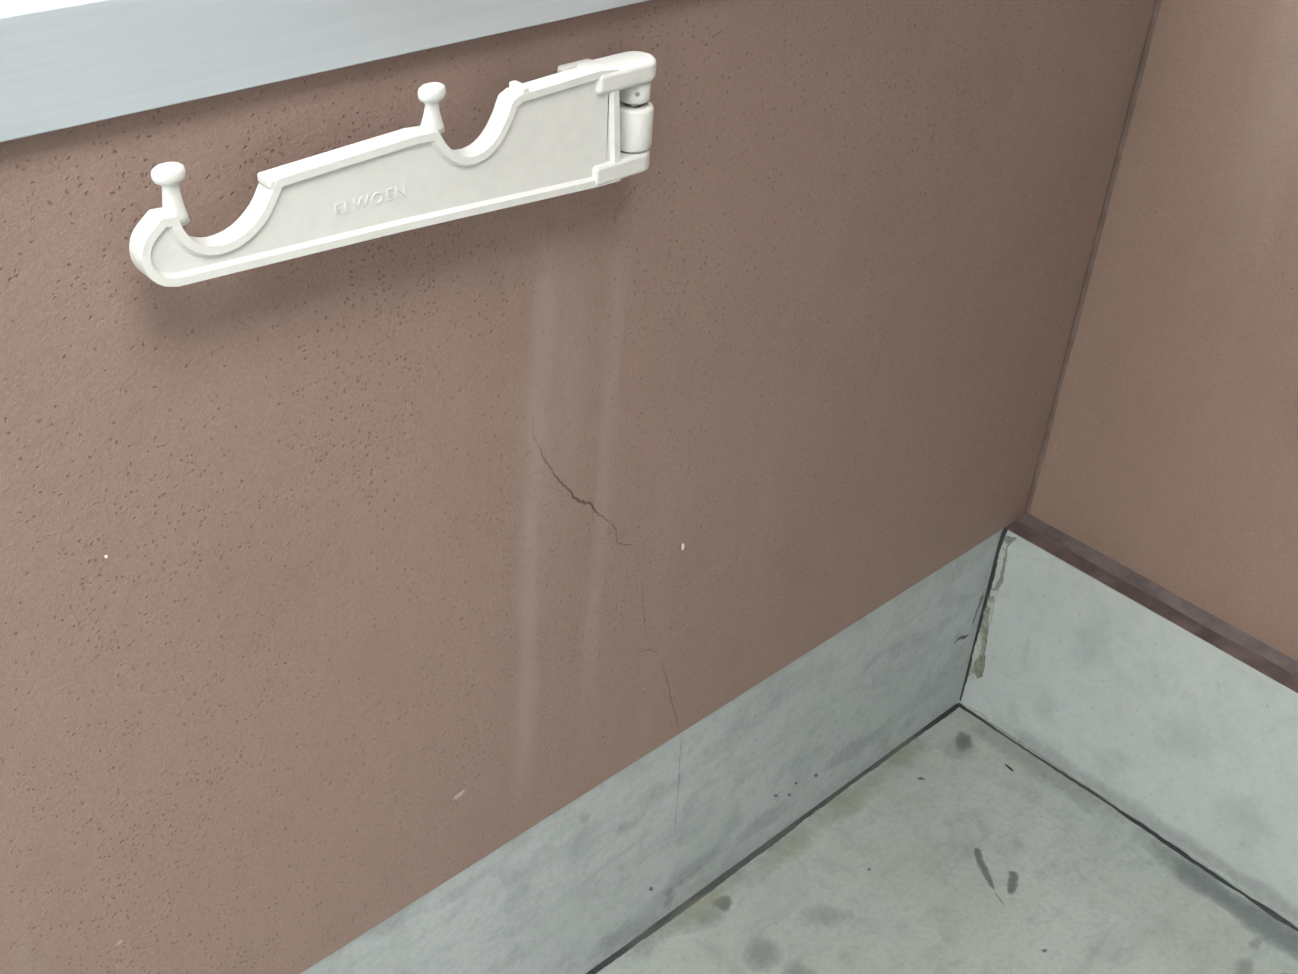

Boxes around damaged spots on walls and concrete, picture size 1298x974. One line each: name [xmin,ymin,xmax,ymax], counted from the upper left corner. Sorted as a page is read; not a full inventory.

crack [539,448,628,545]
peeling [969,536,1016,679]